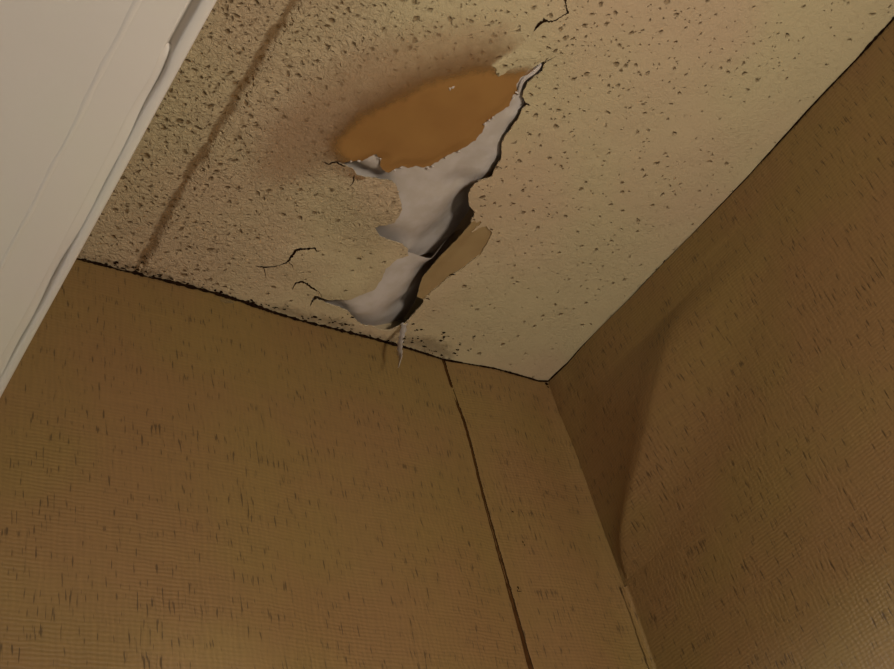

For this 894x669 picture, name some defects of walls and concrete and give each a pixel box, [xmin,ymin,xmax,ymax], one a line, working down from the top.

flaking render [312,49,544,326]
crack [534,0,569,31]
crack [697,17,894,229]
crack [77,247,611,669]